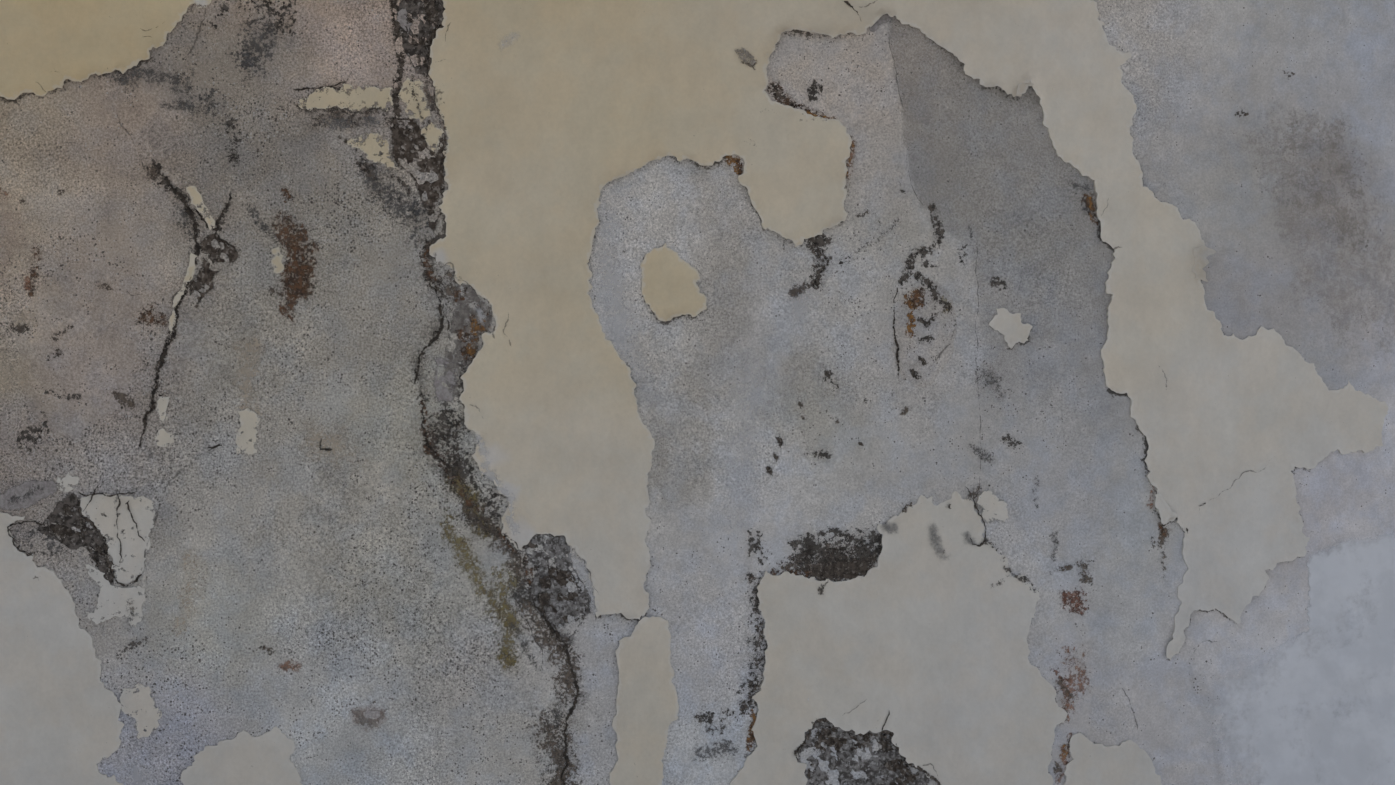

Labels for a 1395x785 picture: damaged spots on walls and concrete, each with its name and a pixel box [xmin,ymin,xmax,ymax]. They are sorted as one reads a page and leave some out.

peeling [0,0,212,100]
crack [139,163,236,447]
rust [247,188,319,322]
crack [412,283,469,489]
peeling [298,0,1388,785]
rust [903,287,951,338]
peeling [0,472,162,785]
crack [532,598,579,785]
rust [1053,645,1090,783]
rust [1062,588,1089,615]